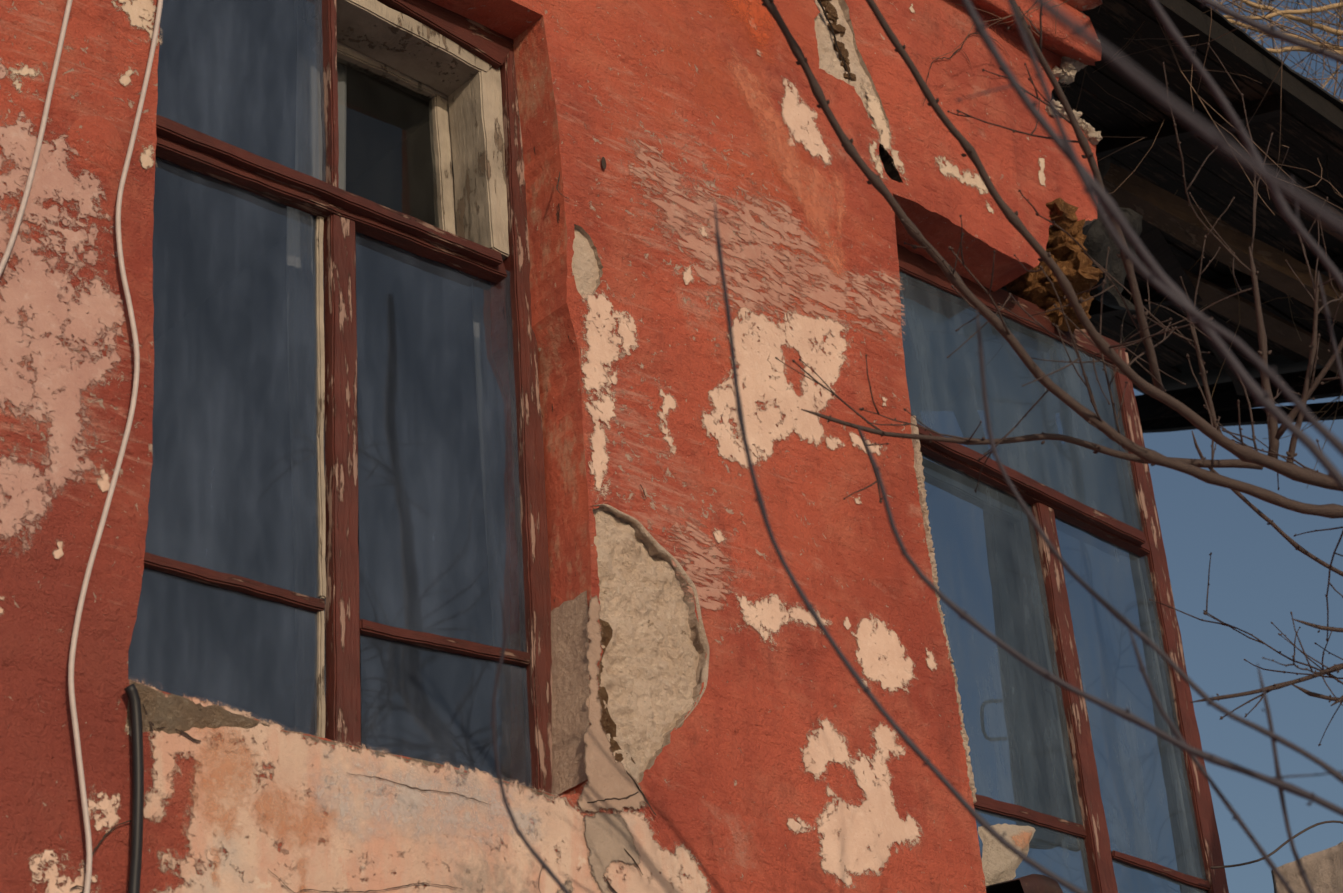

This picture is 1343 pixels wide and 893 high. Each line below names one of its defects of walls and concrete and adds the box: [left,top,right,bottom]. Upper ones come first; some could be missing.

peeling [111,0,163,46]
peeling [119,66,134,86]
peeling [139,145,154,169]
peeling [778,75,832,165]
peeling [862,85,908,185]
peeling [0,58,126,555]
peeling [626,137,906,469]
peeling [53,539,64,559]
peeling [125,229,977,893]
peeling [29,850,98,893]